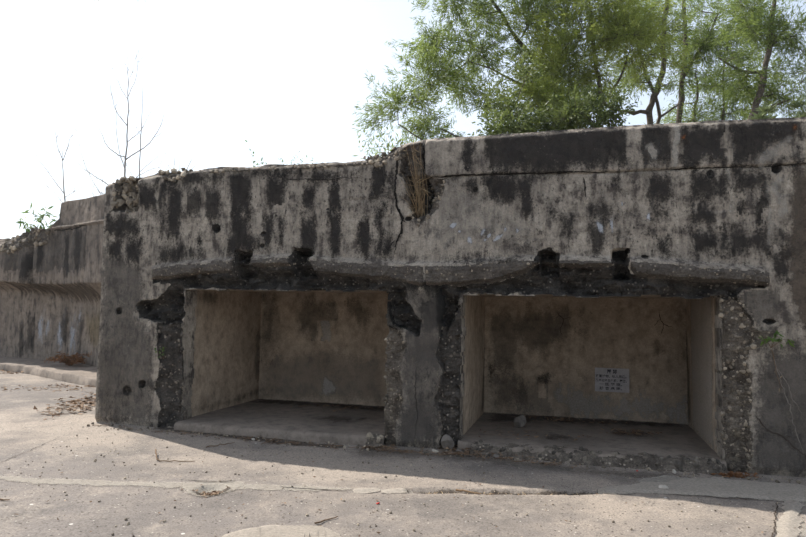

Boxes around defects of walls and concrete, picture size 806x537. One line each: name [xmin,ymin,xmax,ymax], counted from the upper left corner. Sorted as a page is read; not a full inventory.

spalling [110,176,140,213]
damp [138,166,341,263]
damp [357,166,395,262]
crack [387,154,405,253]
crack [422,143,623,197]
damp [461,126,631,220]
damp [550,208,574,239]
damp [587,201,612,258]
damp [640,118,806,329]
damp [4,213,152,424]
spalling [123,247,776,475]
crack [756,345,806,460]